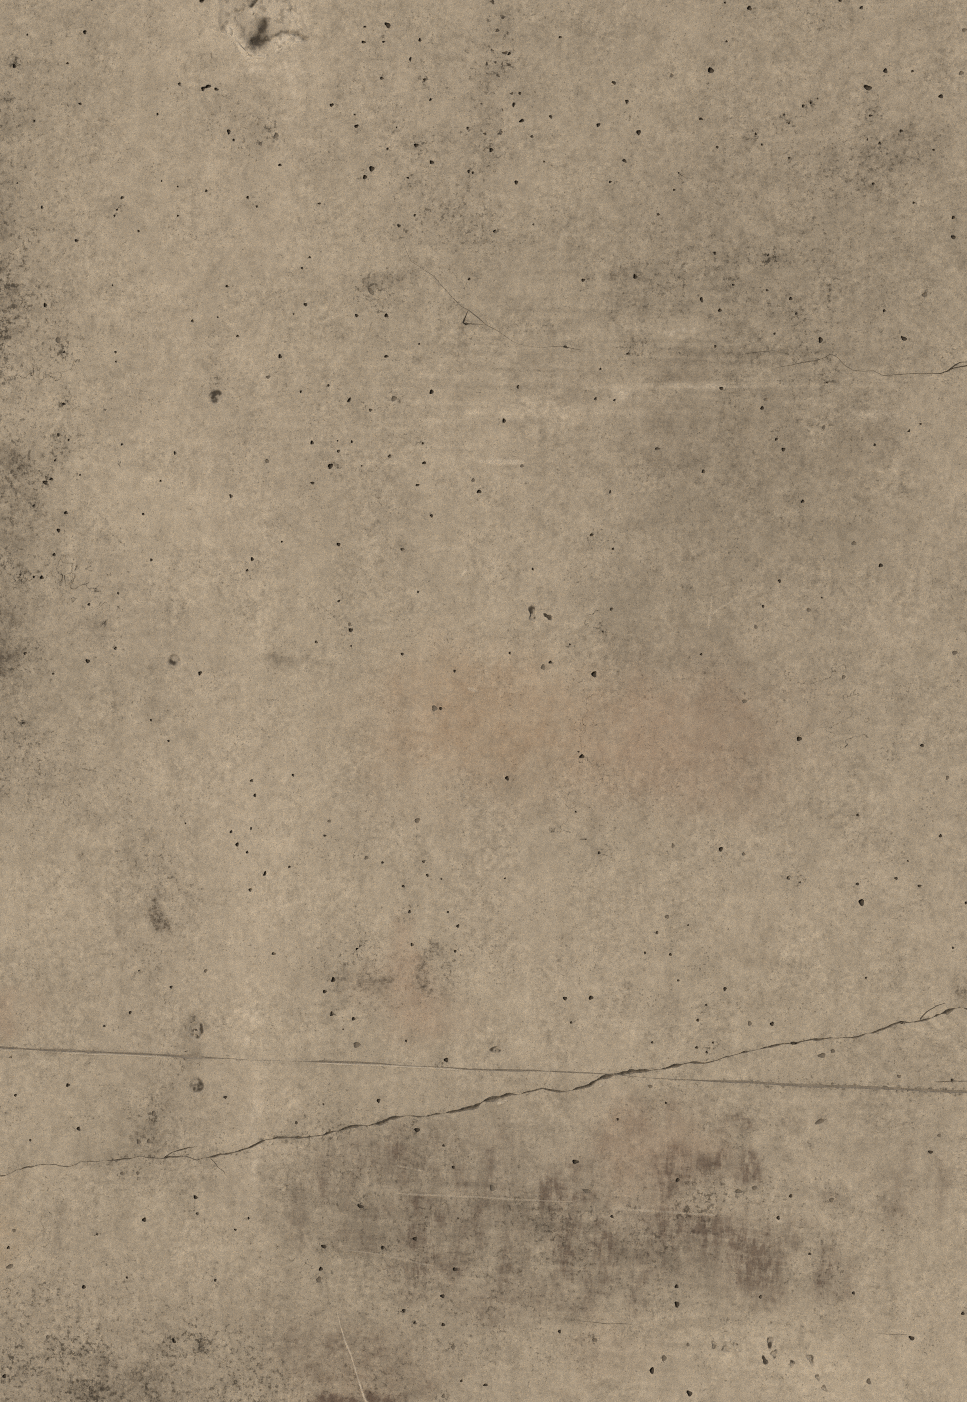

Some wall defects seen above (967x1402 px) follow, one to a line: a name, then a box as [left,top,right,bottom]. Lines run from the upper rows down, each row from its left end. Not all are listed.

spalling [218,0,311,64]
crack [0,1003,967,1177]